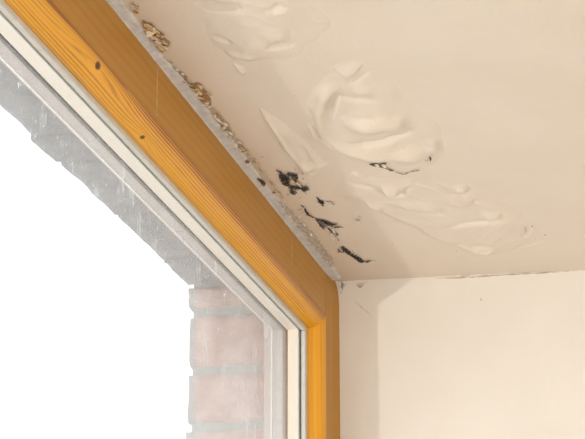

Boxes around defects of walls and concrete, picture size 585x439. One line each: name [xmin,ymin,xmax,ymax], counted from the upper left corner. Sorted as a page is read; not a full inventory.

spalling [142,21,169,52]
peeling [170,63,213,108]
water stain [276,169,309,198]
water stain [301,205,375,263]